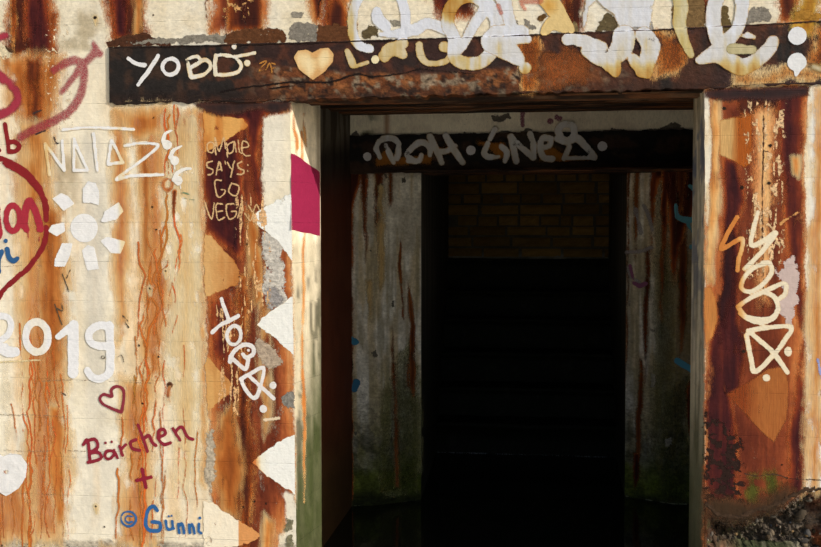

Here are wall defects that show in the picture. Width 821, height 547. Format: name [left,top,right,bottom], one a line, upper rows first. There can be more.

corrosion [93,0,150,40]
corrosion [207,0,269,35]
corrosion [308,0,351,27]
corrosion [434,0,448,20]
corrosion [455,2,475,19]
corrosion [560,0,585,32]
corrosion [517,37,591,95]
corrosion [0,0,75,547]
corrosion [351,150,433,397]
corrosion [703,0,821,503]
corrosion [110,102,307,547]
corrosion [633,171,693,487]